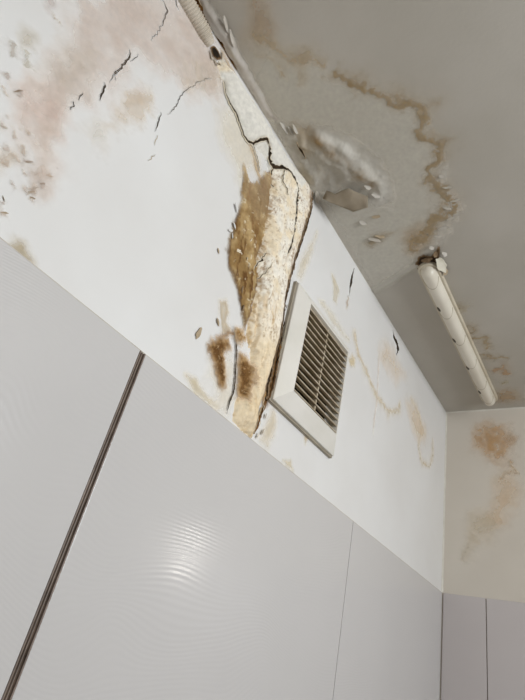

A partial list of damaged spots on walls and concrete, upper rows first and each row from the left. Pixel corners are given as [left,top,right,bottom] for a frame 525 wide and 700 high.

crack [69,49,139,111]
water stain [81,0,216,87]
crack [148,0,313,438]
spalling [218,145,272,331]
water stain [333,71,458,252]
crack [391,330,399,355]